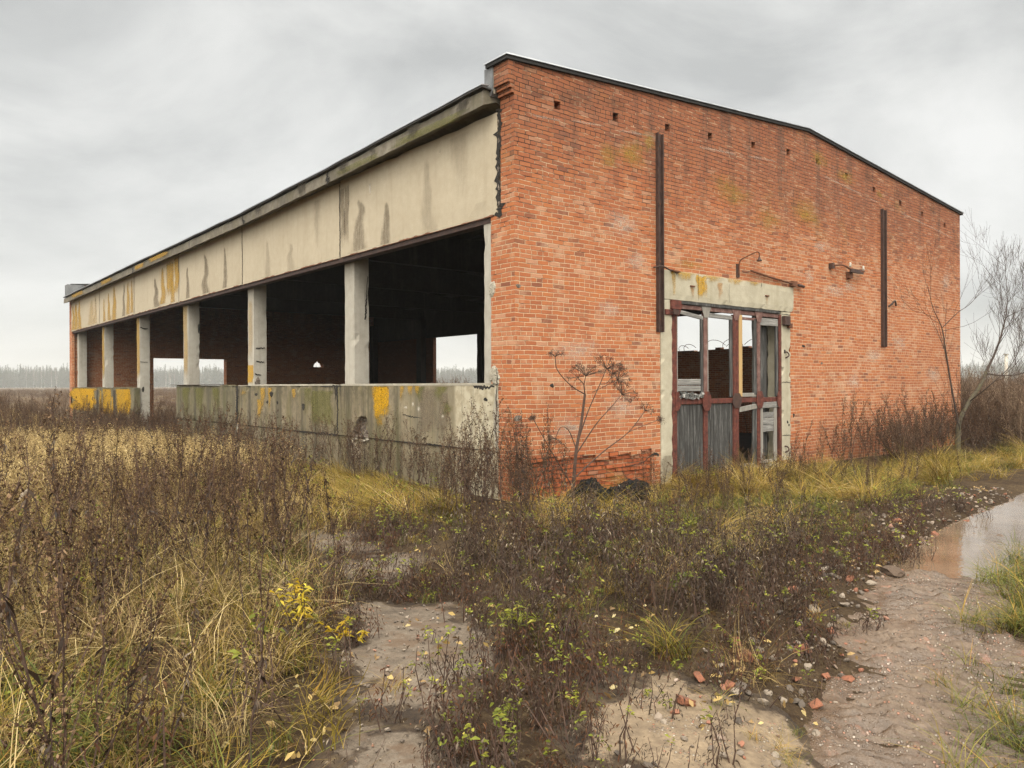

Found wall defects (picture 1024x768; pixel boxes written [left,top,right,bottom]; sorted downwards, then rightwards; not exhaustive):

spalling [528,449,650,500]